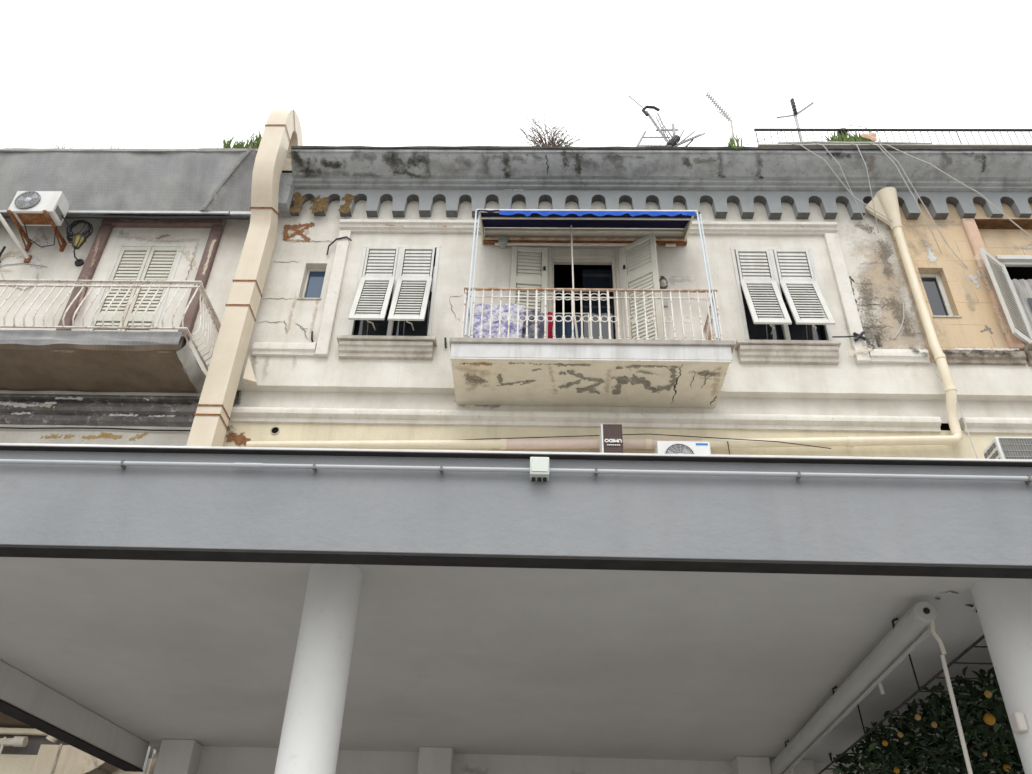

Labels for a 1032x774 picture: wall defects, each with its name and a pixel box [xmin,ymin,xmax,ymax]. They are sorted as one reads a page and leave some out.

water stain [291,151,374,176]
water stain [355,153,430,178]
spalling [282,192,356,242]
water stain [858,242,928,355]
crack [257,298,308,339]
water stain [943,347,1019,357]
spalling [497,369,541,386]
spalling [558,363,678,395]
crack [672,364,717,404]
spalling [226,426,251,446]